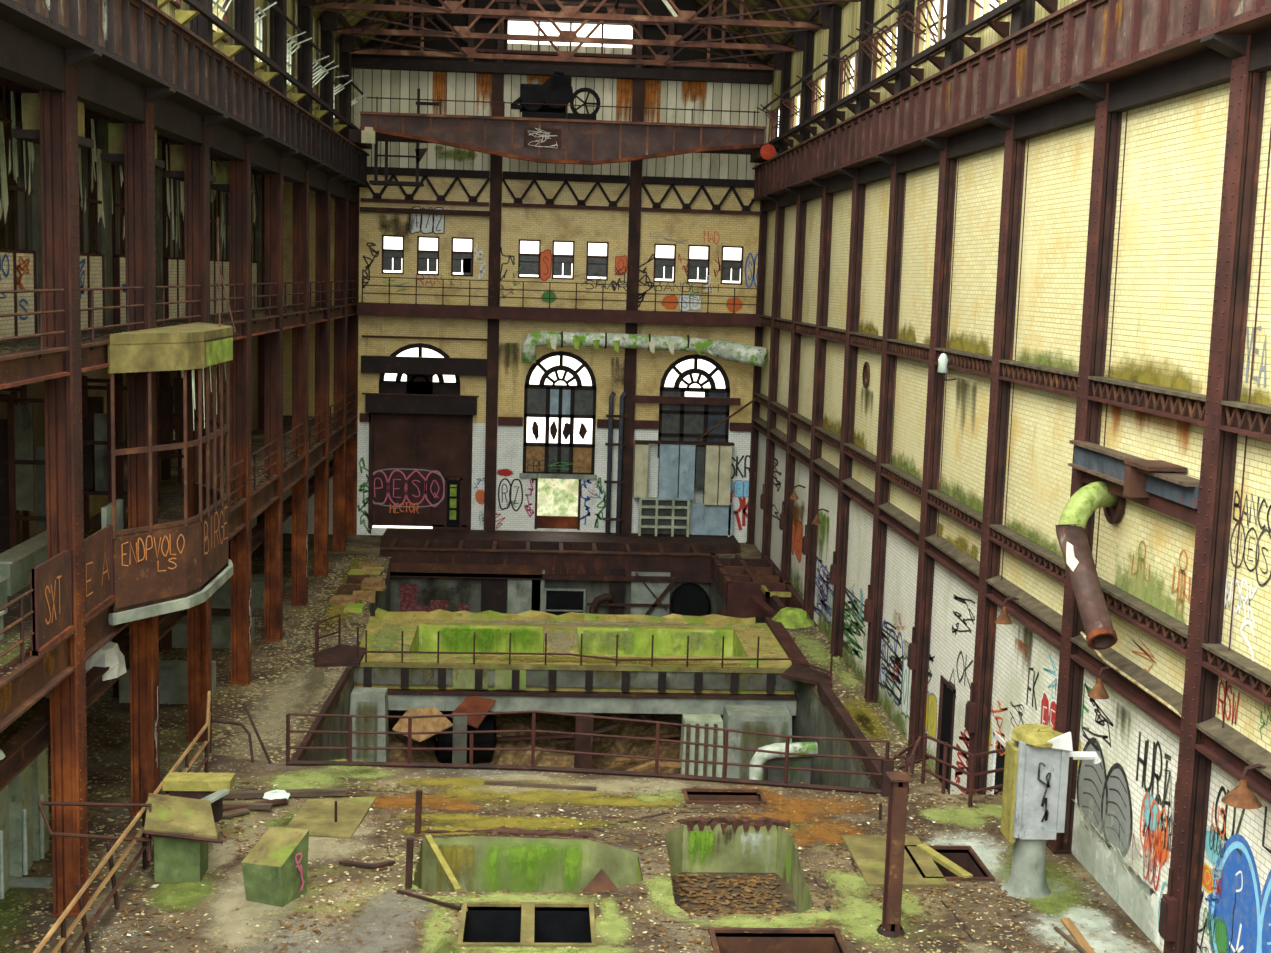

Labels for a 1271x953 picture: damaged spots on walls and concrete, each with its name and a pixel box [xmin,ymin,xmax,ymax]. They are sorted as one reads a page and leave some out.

corrosion [1104,3,1122,34]
corrosion [1016,47,1027,73]
corrosion [433,72,447,112]
corrosion [476,73,492,109]
corrosion [616,79,661,122]
corrosion [682,81,707,101]
damp [957,380,976,408]